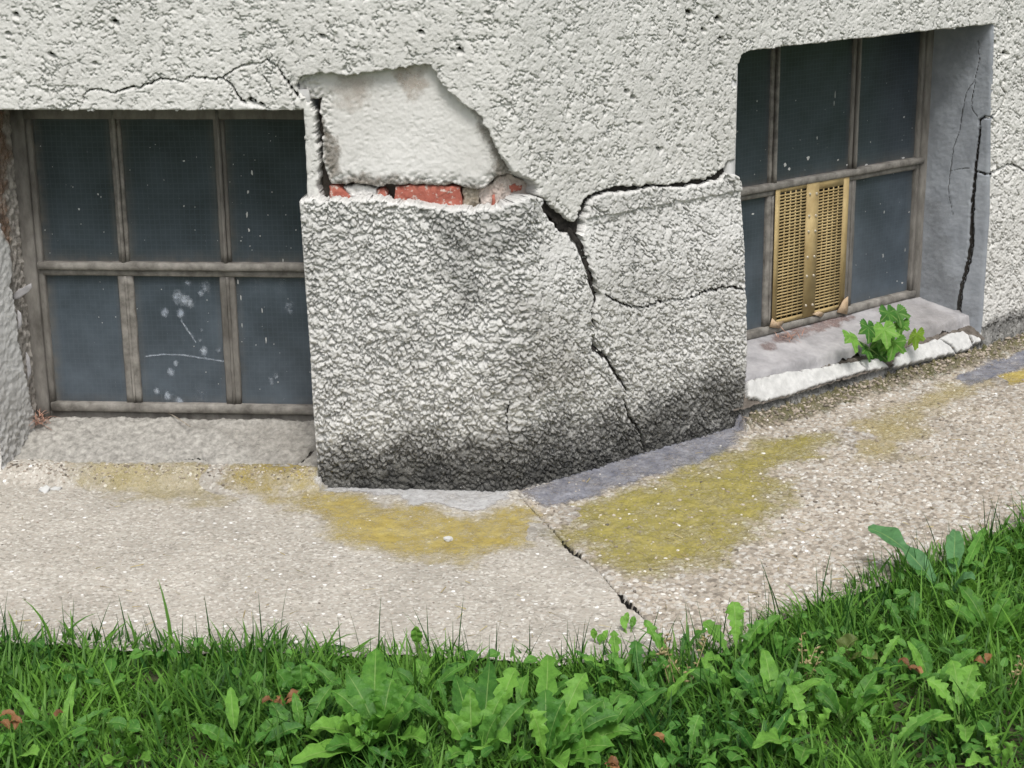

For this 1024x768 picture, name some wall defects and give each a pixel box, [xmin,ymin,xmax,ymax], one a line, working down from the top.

crack [88,59,299,102]
spalling [299,64,528,207]
crack [948,49,1023,312]
crack [537,168,743,452]
water stain [970,313,1024,351]
water stain [315,355,955,511]
crack [518,495,644,619]